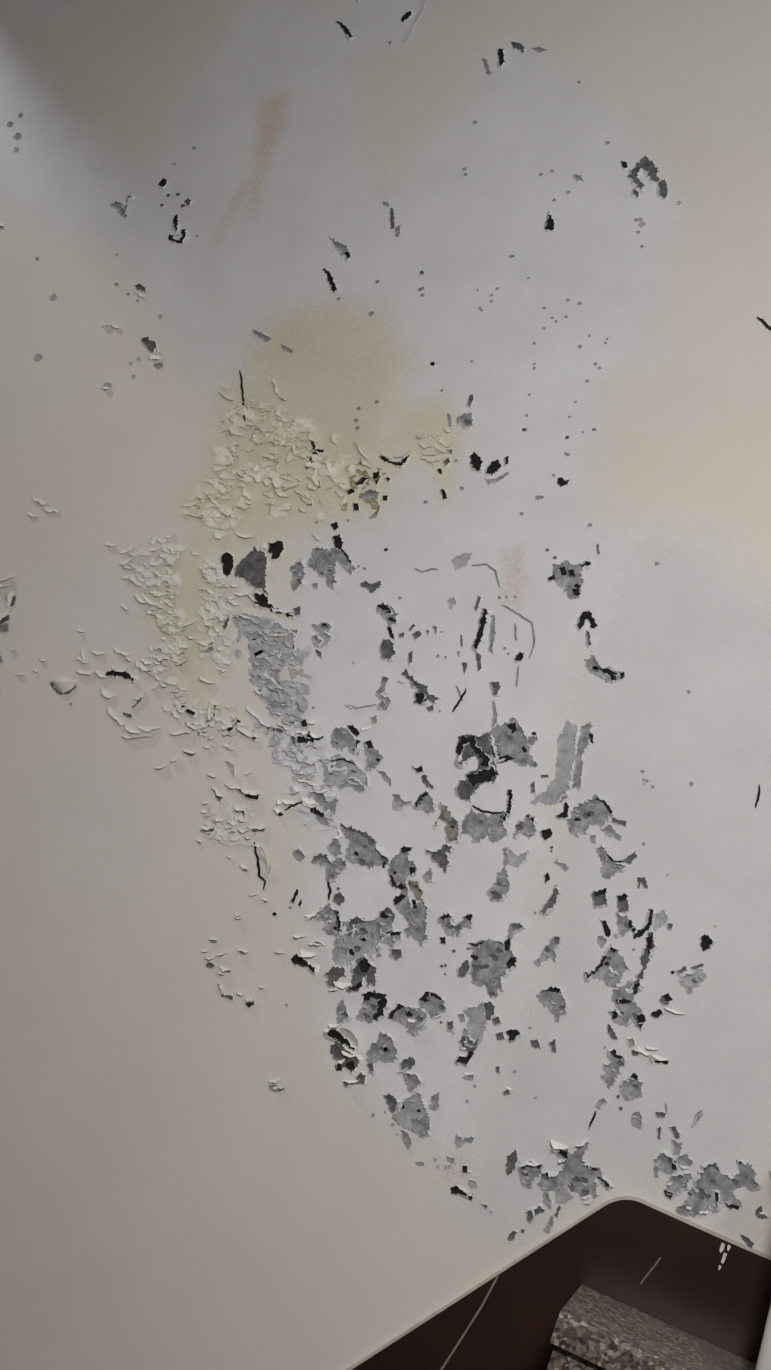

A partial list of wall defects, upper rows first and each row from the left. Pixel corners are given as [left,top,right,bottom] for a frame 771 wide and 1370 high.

leakage [124,287,475,707]
peeling [0,576,16,632]
flaking render [77,0,701,1222]
spalling [671,925,716,994]
spalling [505,1138,614,1241]
spalling [631,1103,771,1219]
peeling [740,1234,755,1248]